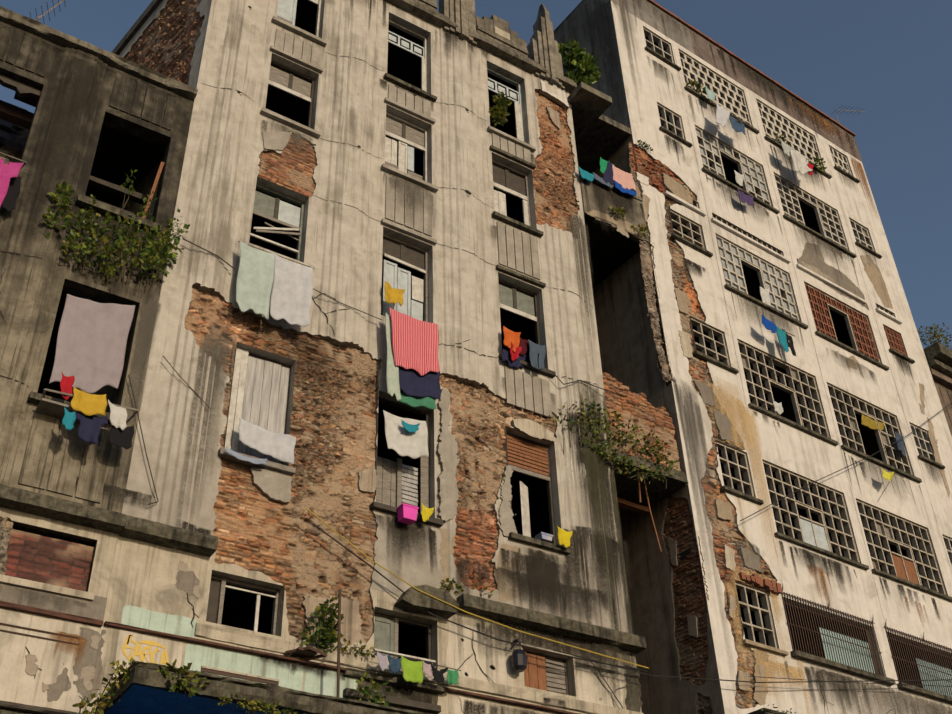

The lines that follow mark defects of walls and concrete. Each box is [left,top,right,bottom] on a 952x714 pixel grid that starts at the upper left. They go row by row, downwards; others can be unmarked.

spalling [125,0,204,85]
damp [586,0,636,87]
damp [710,46,851,142]
spalling [258,131,316,203]
spalling [532,81,776,714]
damp [673,379,706,451]
spalling [184,286,382,646]
spalling [436,374,556,602]
spalling [0,518,13,575]
peeling [175,561,201,598]
damp [779,541,856,576]
peeling [25,627,106,704]